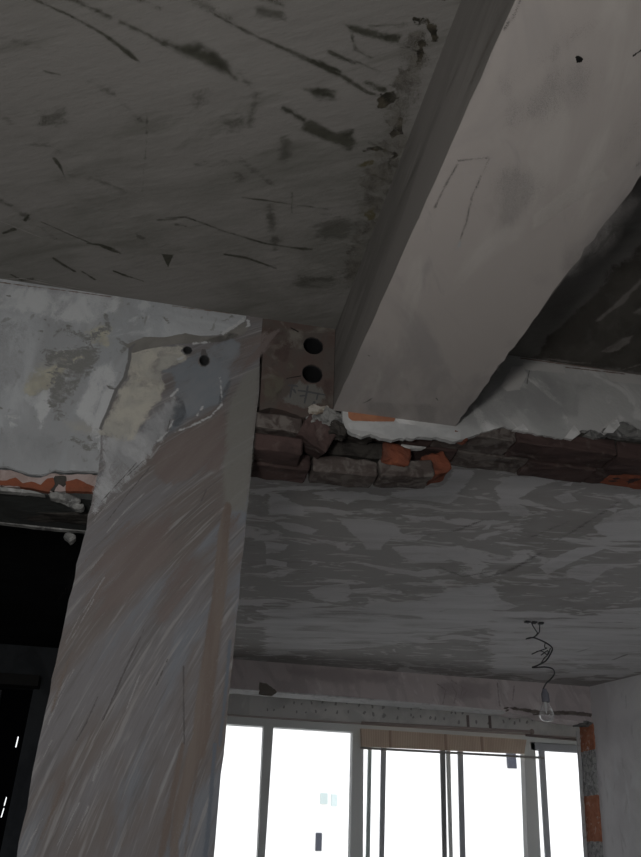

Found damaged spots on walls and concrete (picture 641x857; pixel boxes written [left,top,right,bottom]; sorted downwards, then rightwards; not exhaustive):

peeling [501,358,641,391]
spalling [250,394,641,489]
flaking render [0,466,100,513]
flaking render [64,532,76,545]